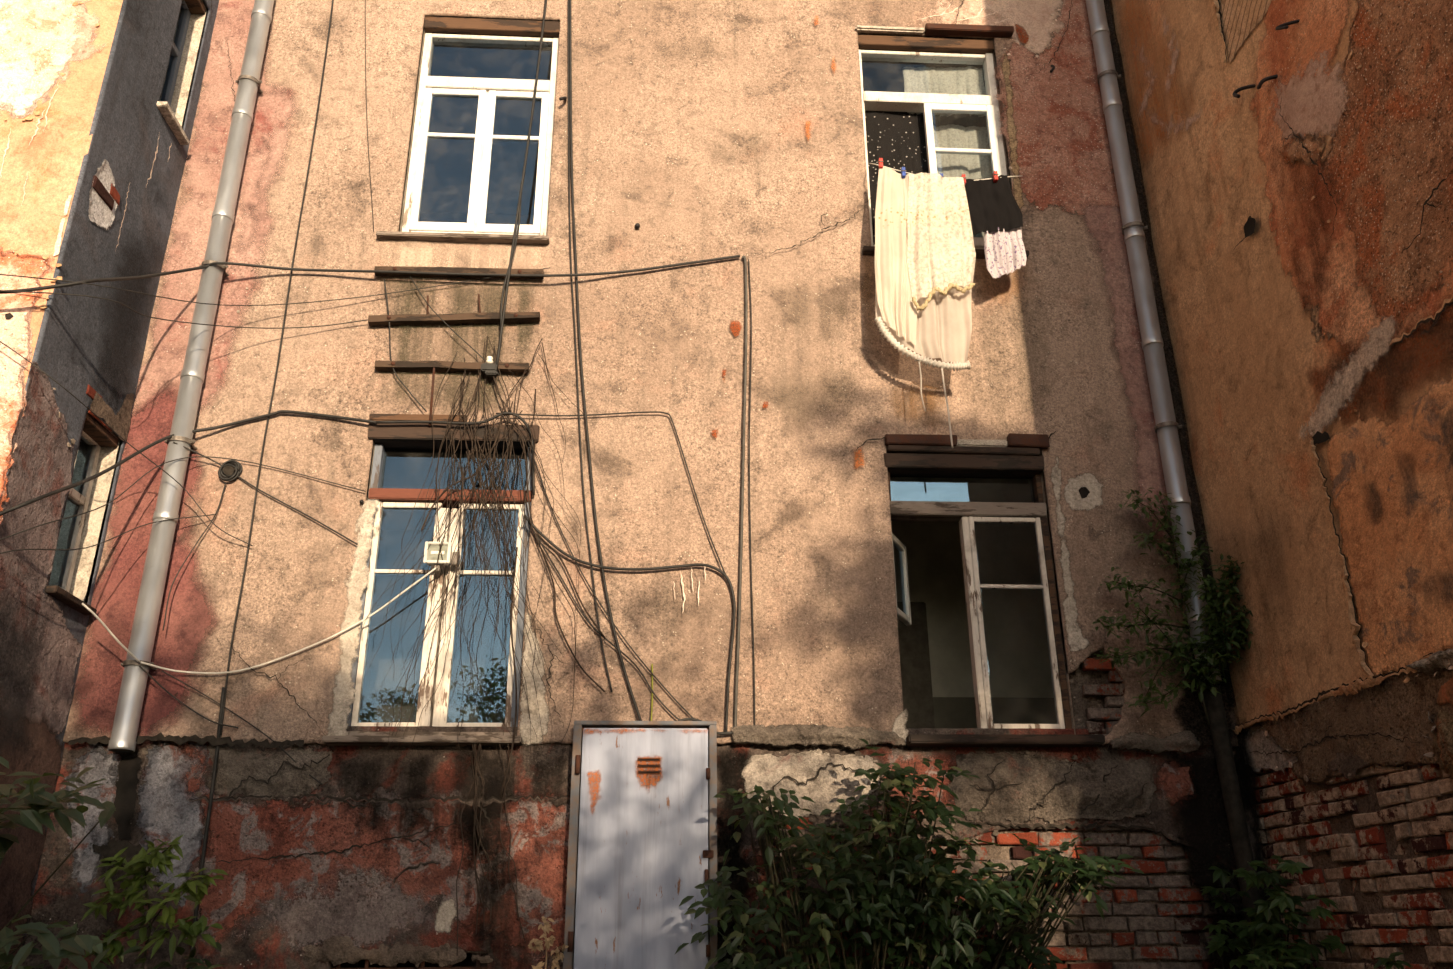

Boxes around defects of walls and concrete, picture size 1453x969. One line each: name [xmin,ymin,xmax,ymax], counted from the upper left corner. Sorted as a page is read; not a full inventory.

flaking render [0,0,100,121]
crack [752,197,871,255]
flaking render [1212,0,1453,354]
crack [1402,173,1453,253]
crack [1389,294,1453,346]
flaking render [0,159,570,969]
flaking render [1327,379,1453,683]
crack [189,775,571,883]
corrosion [587,771,601,811]
corrosion [636,757,661,786]
flaking render [738,746,1217,969]
flaking render [1244,727,1453,969]